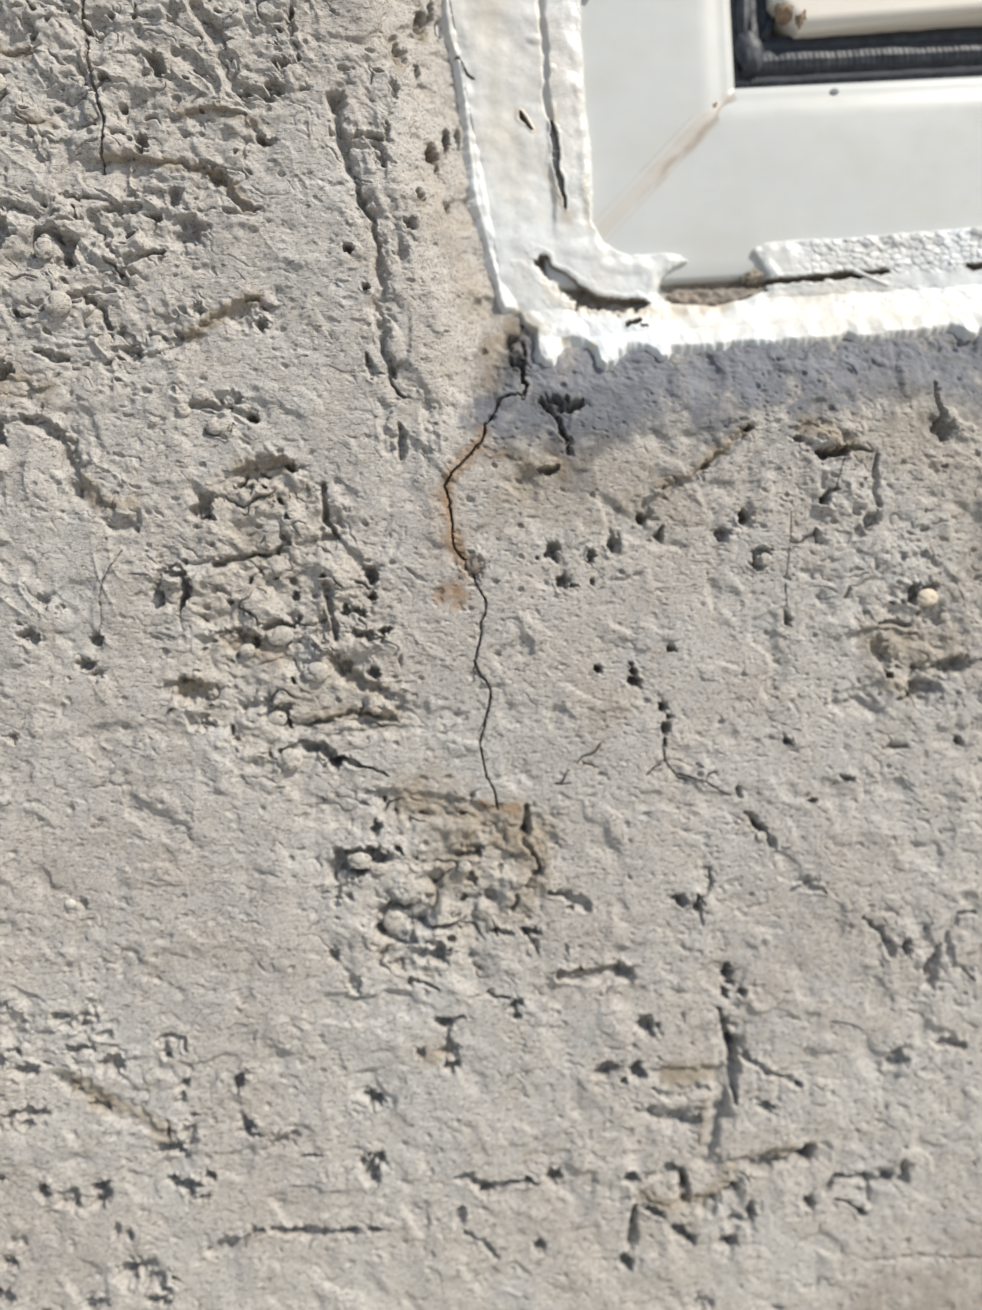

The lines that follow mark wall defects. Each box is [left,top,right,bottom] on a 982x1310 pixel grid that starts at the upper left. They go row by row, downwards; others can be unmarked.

crack [549,119,567,210]
crack [763,269,890,292]
crack [965,262,982,271]
crack [444,324,574,809]
spalling [149,454,406,771]
spalling [869,580,971,702]
crack [648,736,727,794]
spalling [369,788,593,992]
spalling [327,946,340,963]
spalling [346,973,364,996]